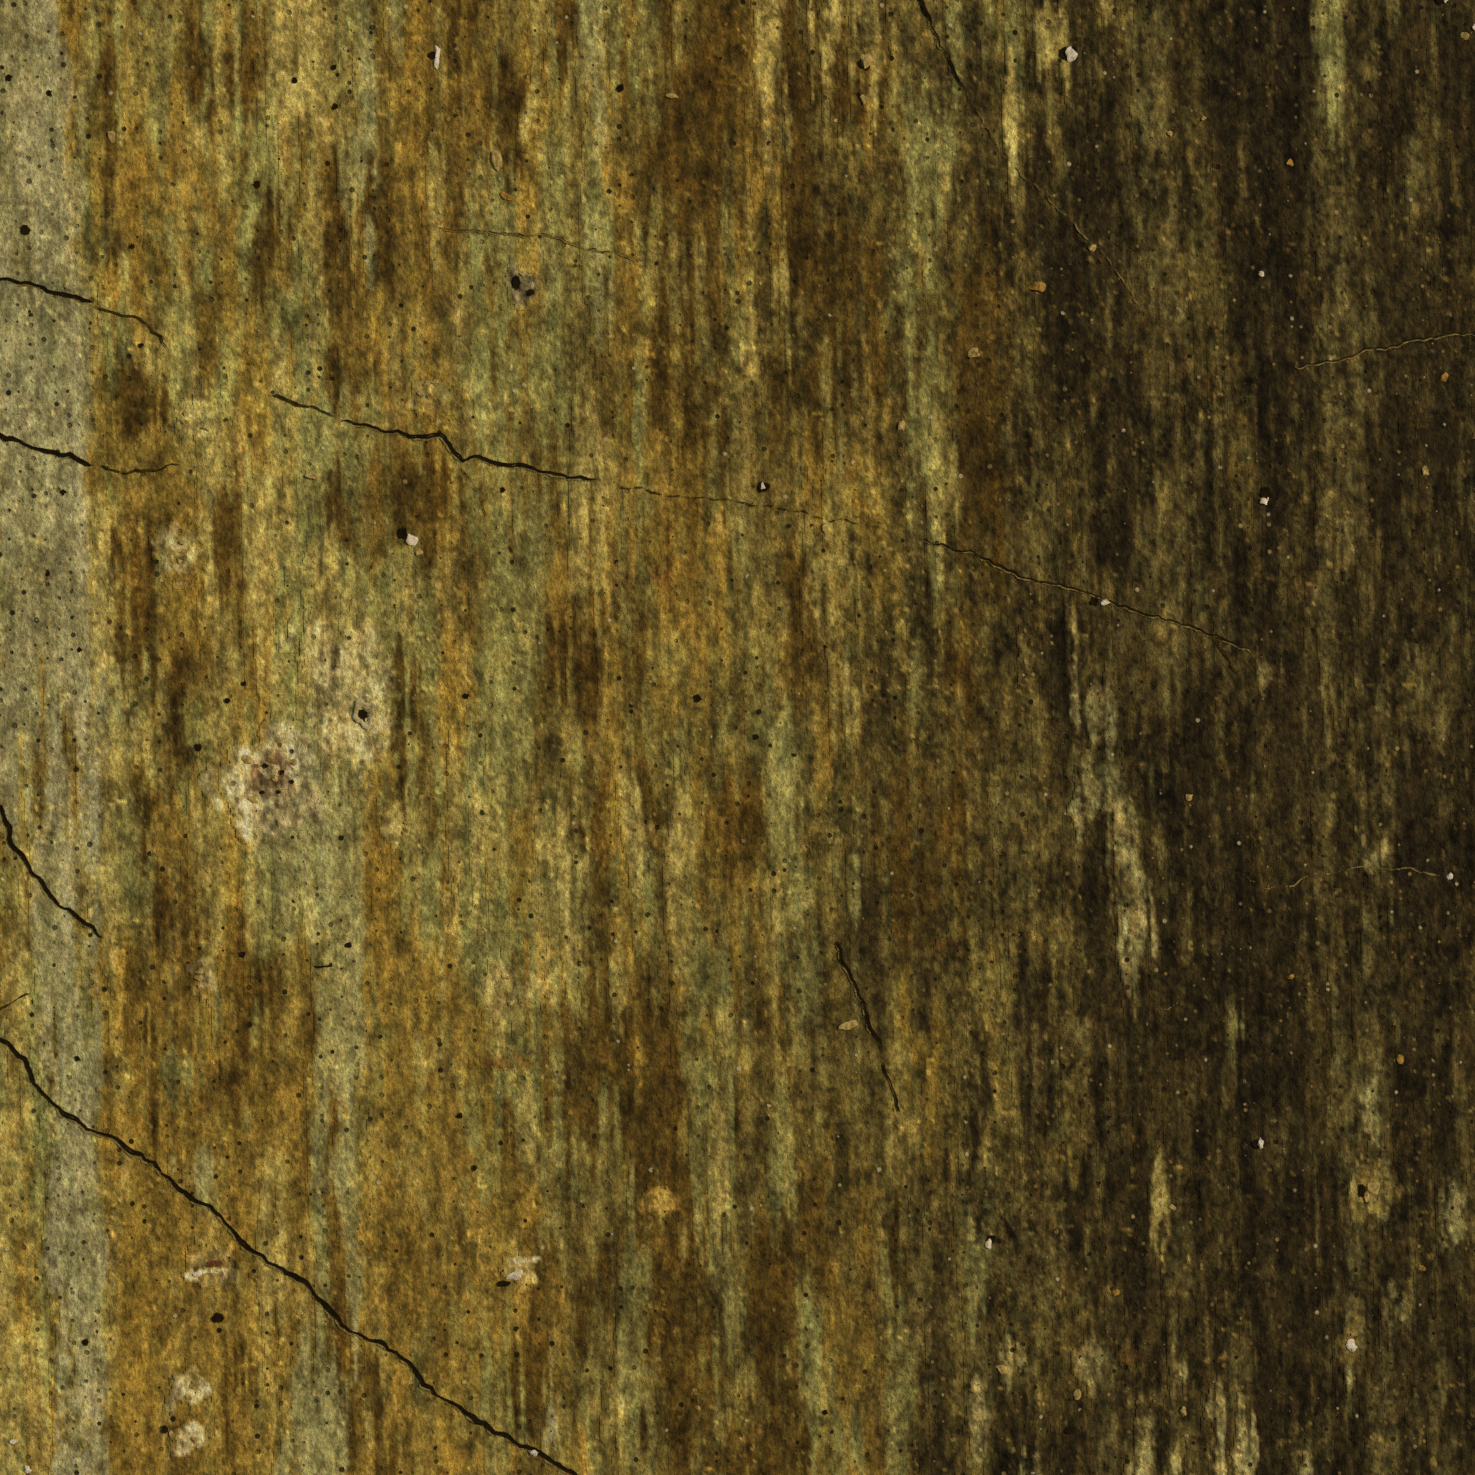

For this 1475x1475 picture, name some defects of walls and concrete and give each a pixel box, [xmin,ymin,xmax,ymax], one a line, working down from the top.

crack [0,277,169,350]
crack [0,433,179,474]
crack [274,394,881,554]
crack [0,805,102,937]
crack [836,941,900,1112]
crack [0,993,578,1475]